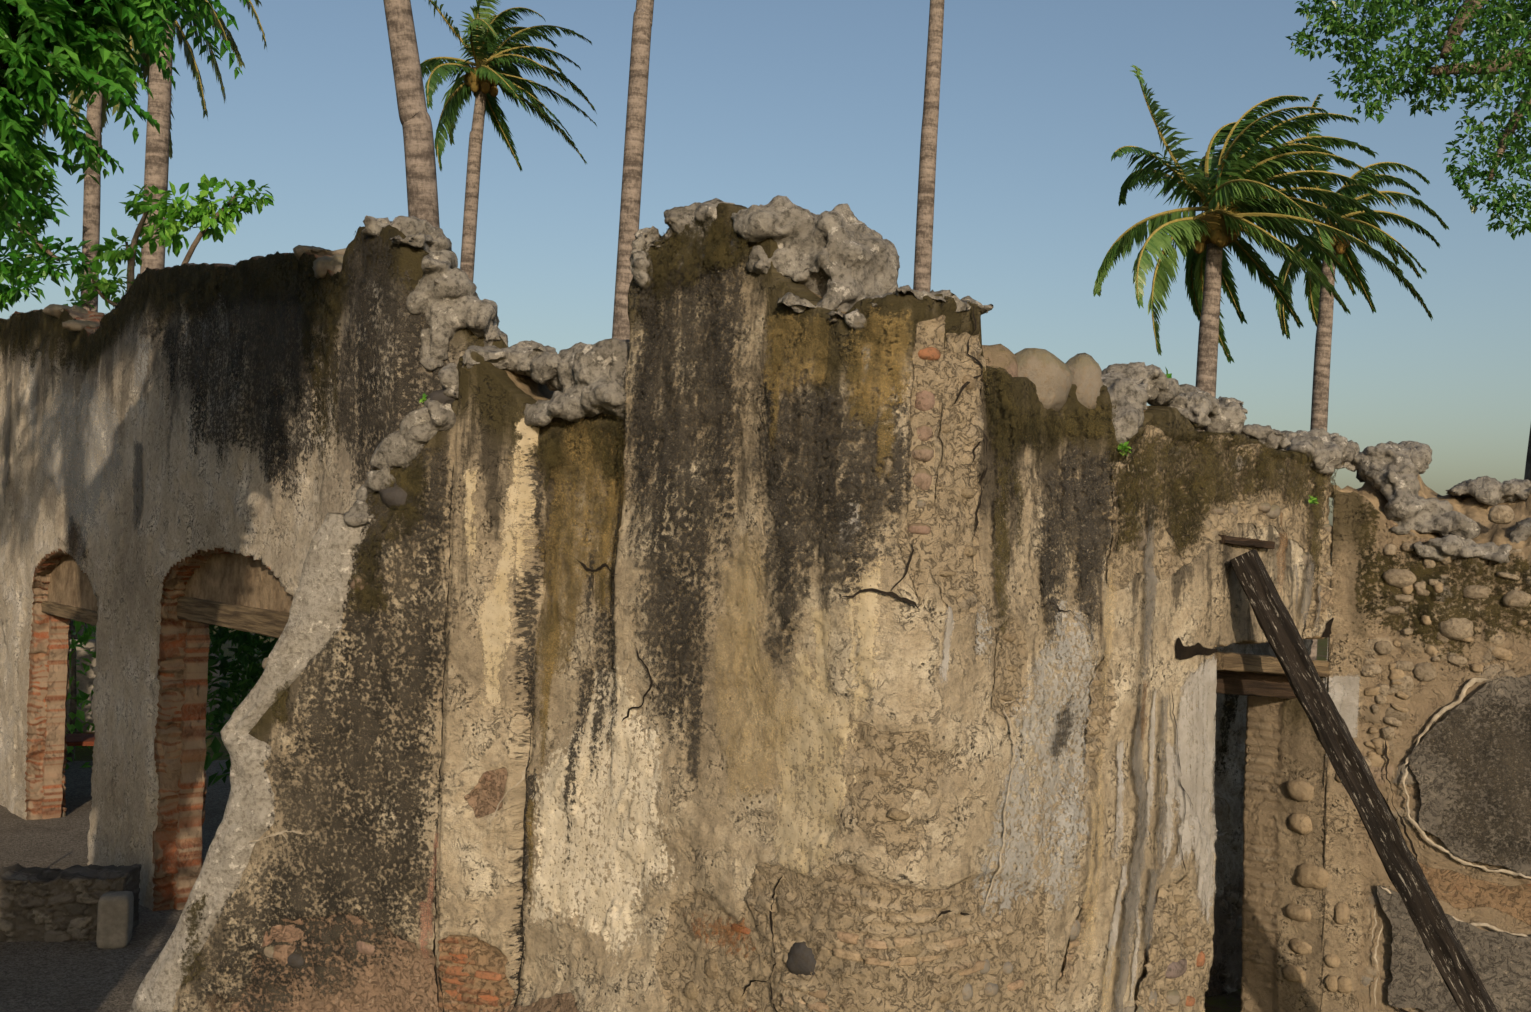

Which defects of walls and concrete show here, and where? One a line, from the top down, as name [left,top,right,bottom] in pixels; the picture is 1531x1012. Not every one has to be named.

damp [2,354,142,573]
flaking render [898,315,986,622]
damp [134,228,477,1012]
damp [476,236,918,1008]
flaking render [810,560,947,859]
damp [940,607,954,681]
flaking render [991,617,1028,719]
damp [972,359,1338,1012]
flaking render [230,913,514,1012]
flaking render [655,862,1094,1012]
flaking render [1134,875,1213,1012]